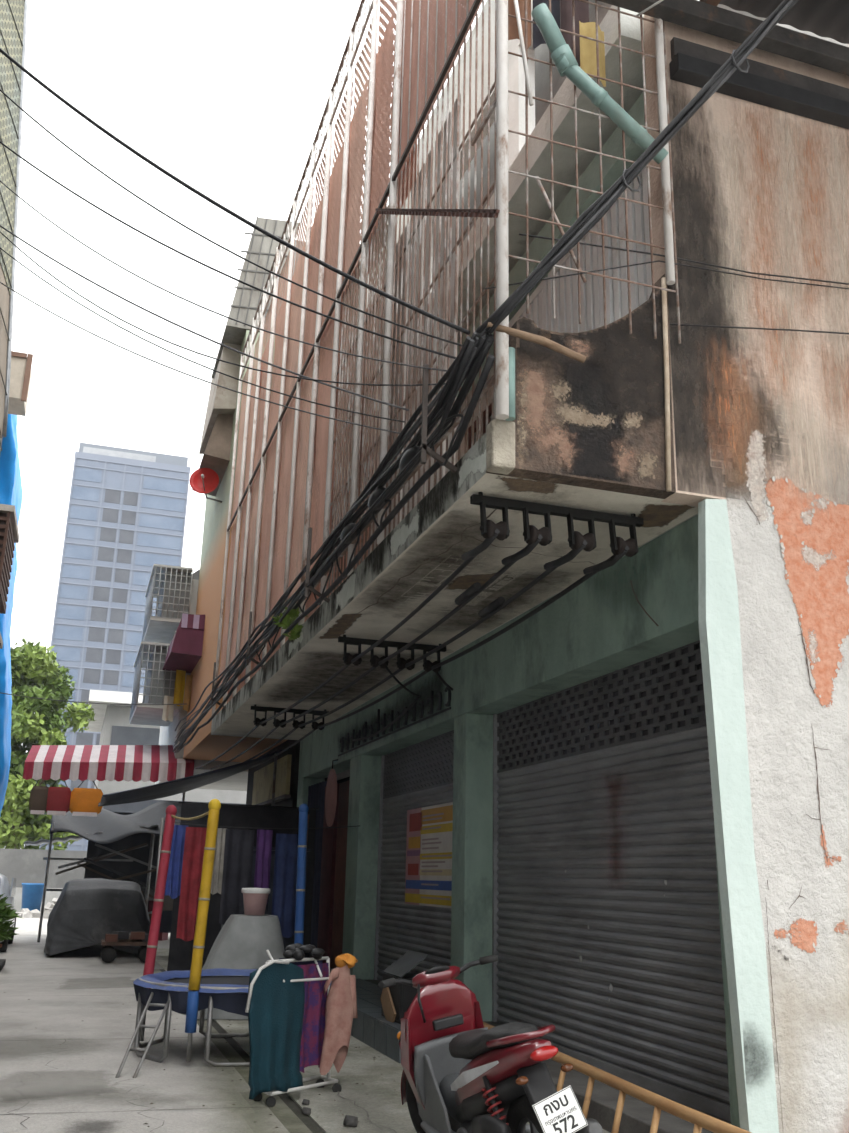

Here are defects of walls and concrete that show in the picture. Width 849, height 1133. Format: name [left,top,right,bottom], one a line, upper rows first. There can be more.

damp [517,80,849,504]
damp [442,574,567,630]
peeling [764,476,849,708]
crack [806,729,840,862]
peeling [774,918,820,953]